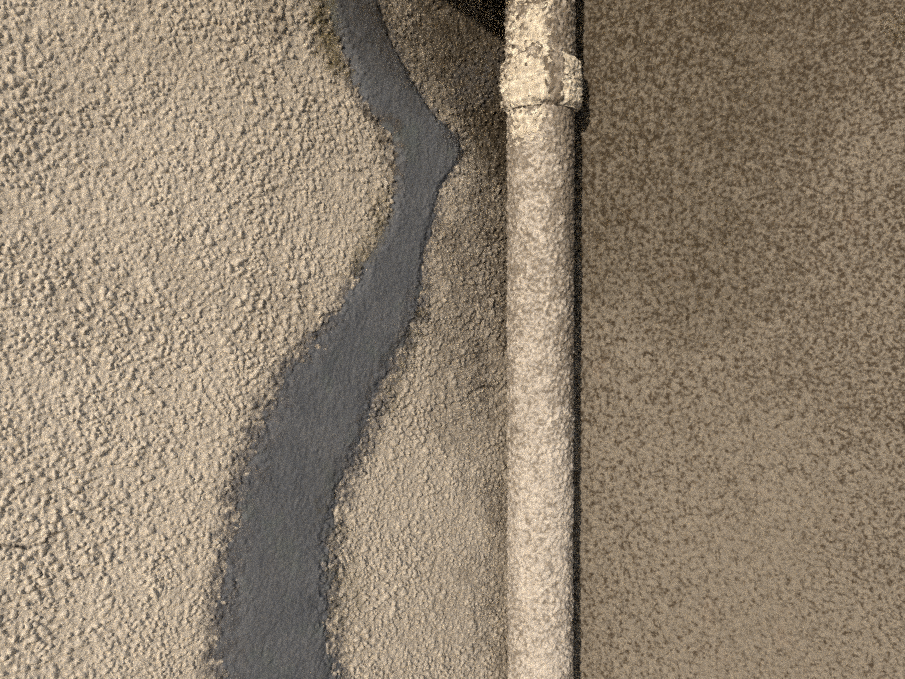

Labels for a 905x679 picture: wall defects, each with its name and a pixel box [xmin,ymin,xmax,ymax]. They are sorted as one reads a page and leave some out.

water stain [425,0,507,165]